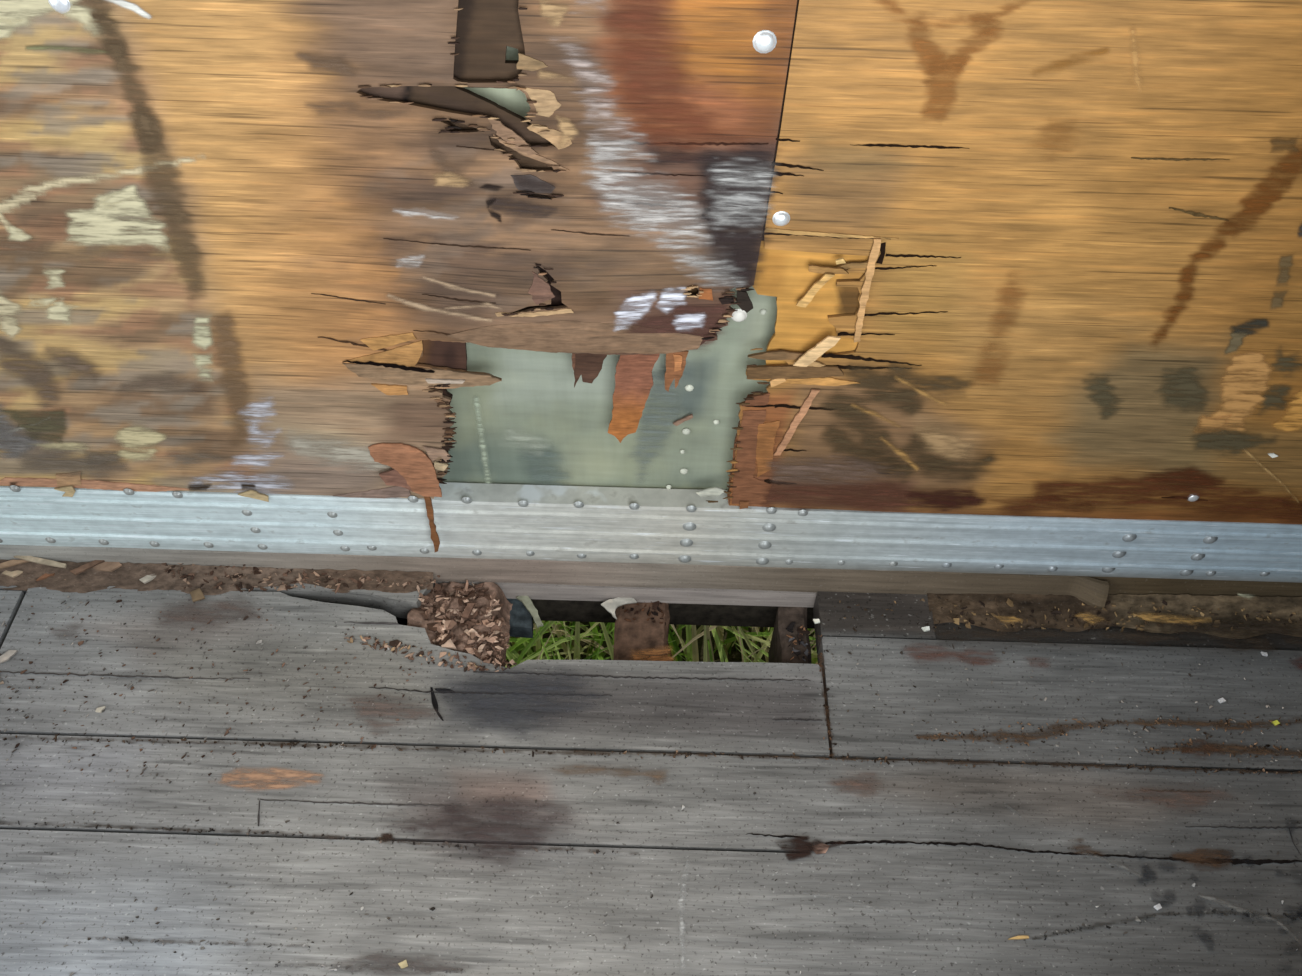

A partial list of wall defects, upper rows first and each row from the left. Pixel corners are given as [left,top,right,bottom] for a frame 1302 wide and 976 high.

peeling [516,52,548,71]
peeling [487,87,572,193]
peeling [764,227,899,239]
damp [1155,150,1302,339]
peeling [808,257,868,274]
peeling [495,271,574,317]
peeling [699,288,753,313]
peeling [770,361,858,387]
peeling [423,446,451,471]
peeling [333,469,413,498]
crack [1019,762,1298,793]
crack [748,826,1302,865]